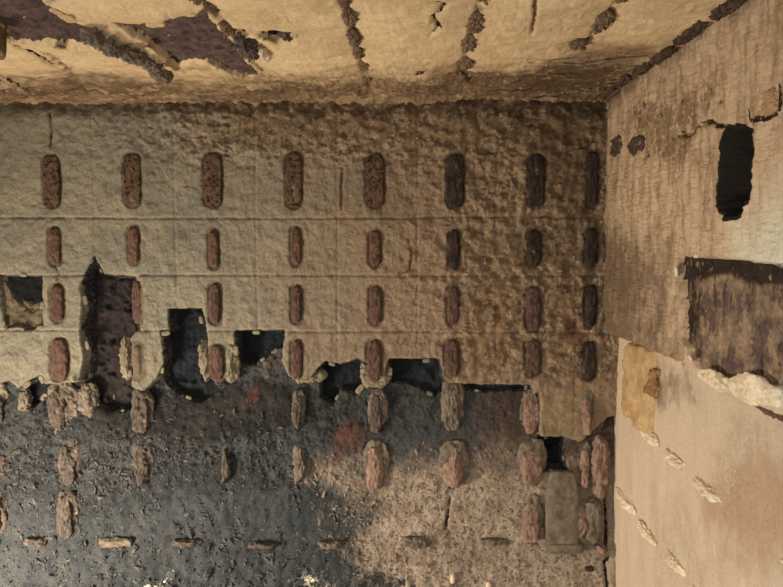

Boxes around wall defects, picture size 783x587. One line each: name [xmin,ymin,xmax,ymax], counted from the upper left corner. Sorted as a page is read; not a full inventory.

spalling [0,0,83,50]
spalling [110,9,258,77]
crack [431,1,446,33]
crack [530,0,538,31]
crack [678,83,782,138]
spalling [1,273,45,331]
spalling [83,259,136,412]
spalling [161,309,219,400]
spalling [234,330,285,363]
spalling [674,255,783,408]
water stain [231,476,311,558]
water stain [288,568,334,587]